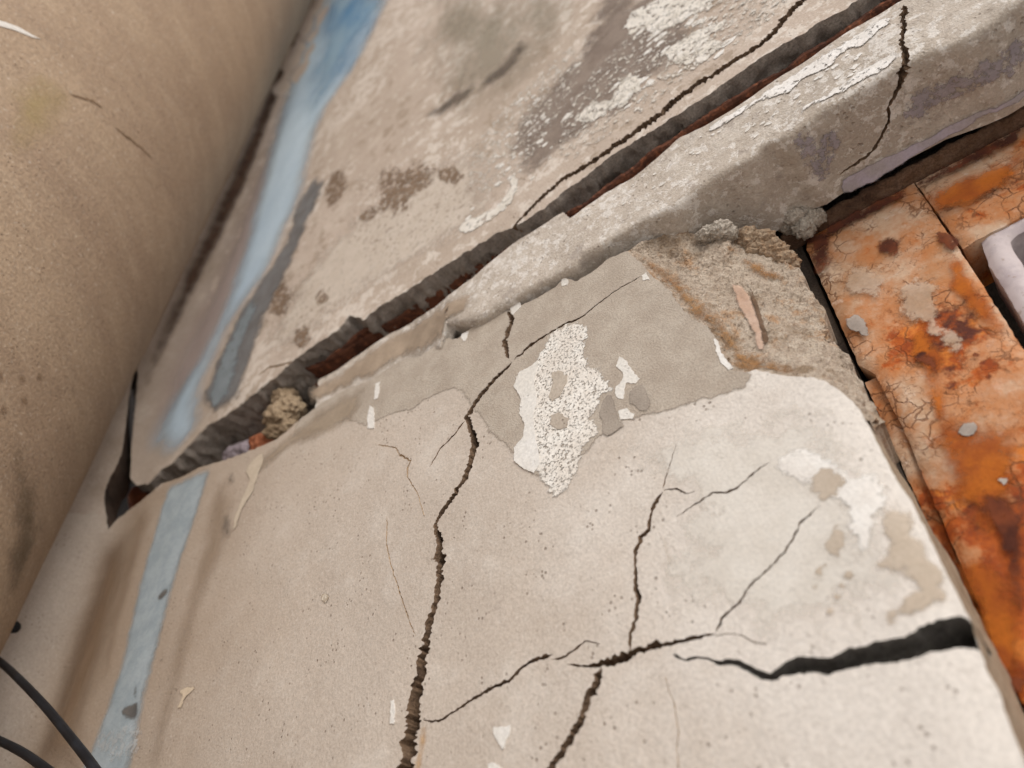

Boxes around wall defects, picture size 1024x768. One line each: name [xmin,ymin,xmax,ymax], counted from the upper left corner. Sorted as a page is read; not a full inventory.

leakage [266,276,335,353]
leakage [324,161,477,257]
corrosion [305,246,509,387]
crack [104,0,911,529]
peeling [294,218,900,500]
peeling [458,0,786,233]
corrosion [565,0,902,217]
peeling [700,18,897,139]
corrosion [806,191,904,272]
crack [379,278,991,768]
peeling [878,509,946,624]
corrosion [912,329,1024,692]